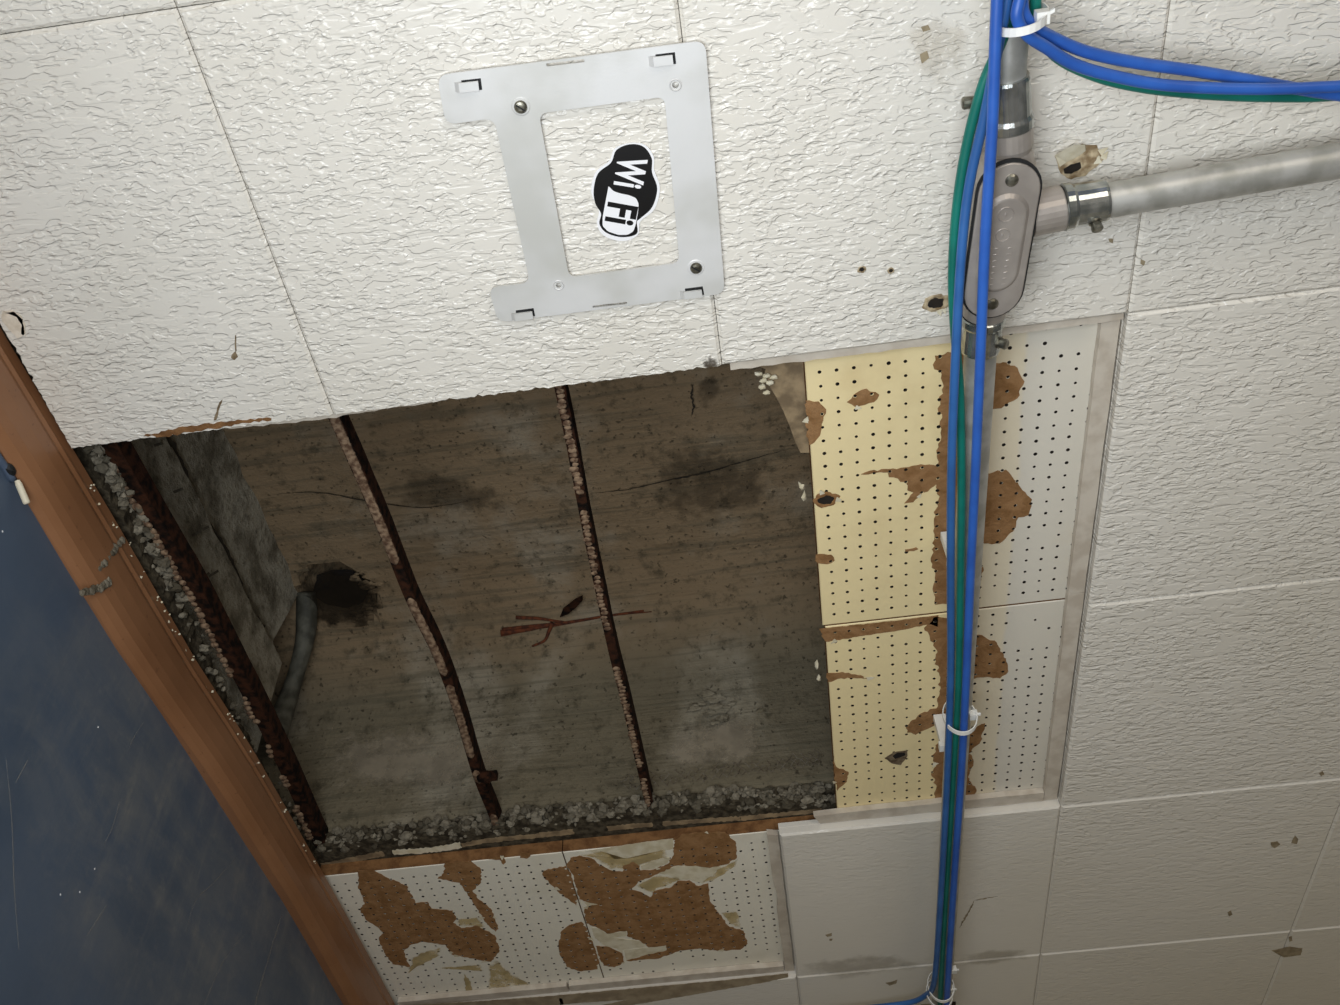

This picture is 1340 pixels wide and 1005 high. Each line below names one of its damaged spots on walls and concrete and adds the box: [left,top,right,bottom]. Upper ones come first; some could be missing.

spalling [144,399,271,437]
damp [304,571,380,627]
spalling [885,750,907,765]